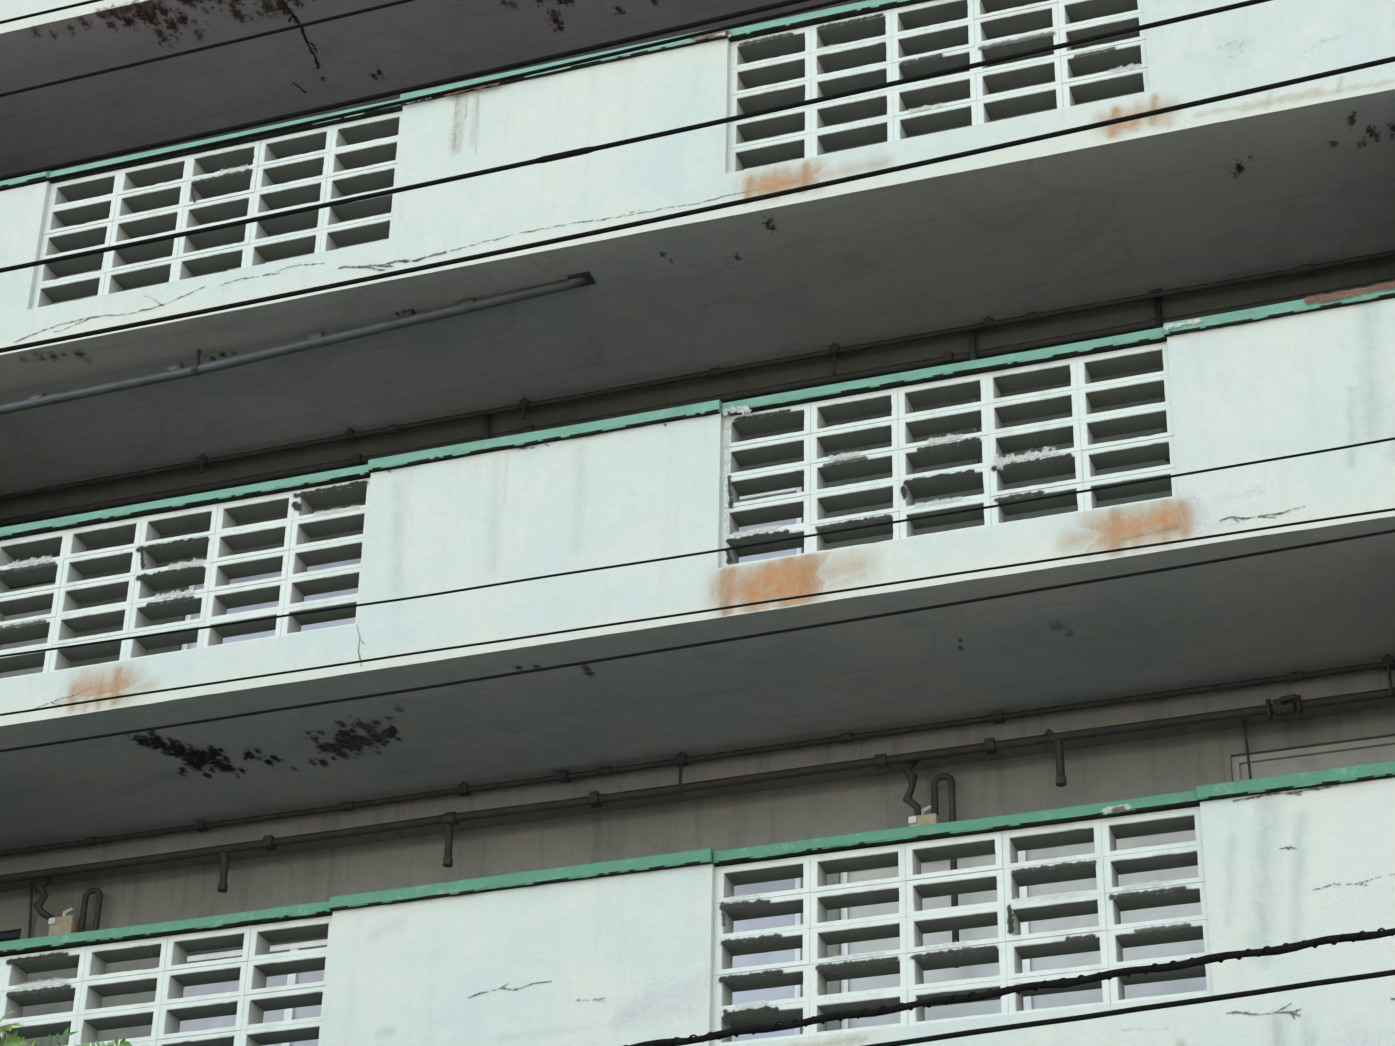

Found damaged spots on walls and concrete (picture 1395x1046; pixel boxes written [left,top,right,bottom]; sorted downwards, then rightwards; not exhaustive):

peeling [34,0,304,47]
peeling [537,0,574,32]
corrosion [745,163,819,198]
crack [15,189,758,342]
corrosion [1091,503,1188,549]
corrosion [720,554,824,615]
corrosion [70,669,130,707]
peeling [127,716,401,779]
crack [468,981,603,1001]
crack [1227,1003,1301,1019]